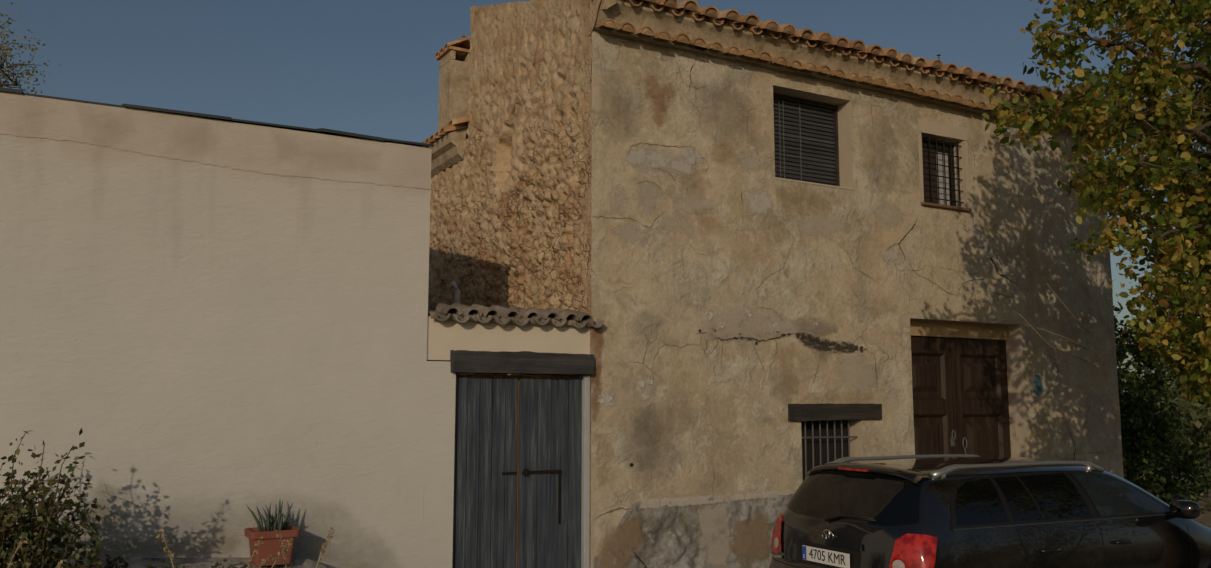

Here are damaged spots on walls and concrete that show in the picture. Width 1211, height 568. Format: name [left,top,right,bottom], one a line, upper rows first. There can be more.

crack [698,221,797,355]
crack [887,213,1020,298]
spalling [600,518,641,568]
spalling [699,504,730,565]